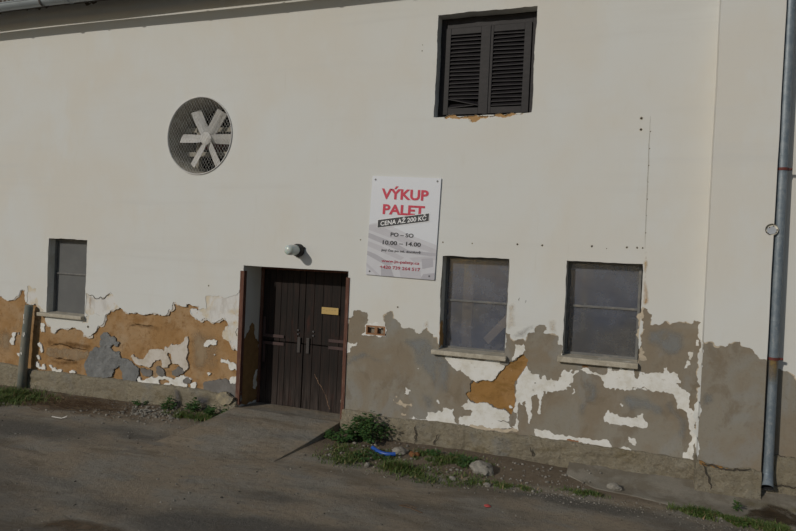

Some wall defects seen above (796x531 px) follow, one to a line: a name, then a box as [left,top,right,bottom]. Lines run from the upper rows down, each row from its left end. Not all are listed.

flaking render [445,113,524,123]
flaking render [0,286,259,405]
peeling [344,307,767,472]
peeling [774,369,796,457]